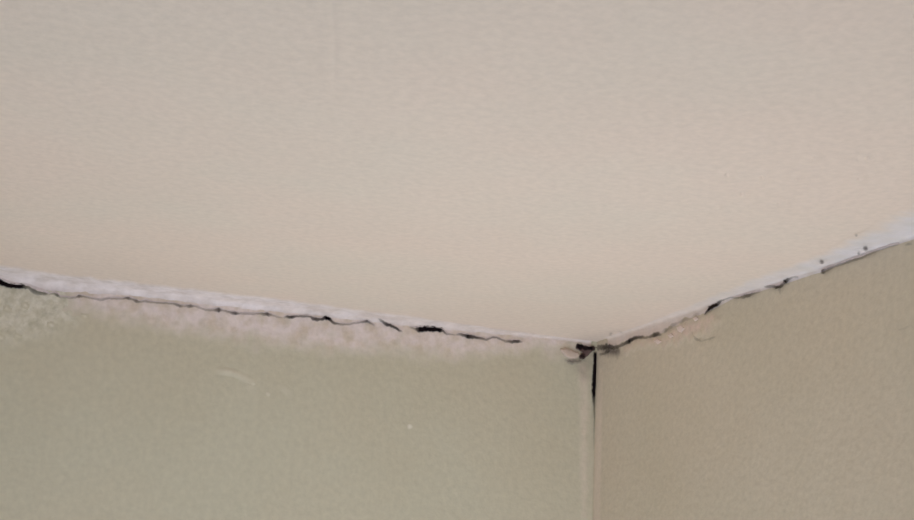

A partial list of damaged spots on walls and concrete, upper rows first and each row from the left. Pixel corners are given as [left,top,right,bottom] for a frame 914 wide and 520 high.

crack [0,277,521,343]
crack [623,332,659,345]
crack [704,242,899,314]
crack [590,352,598,405]